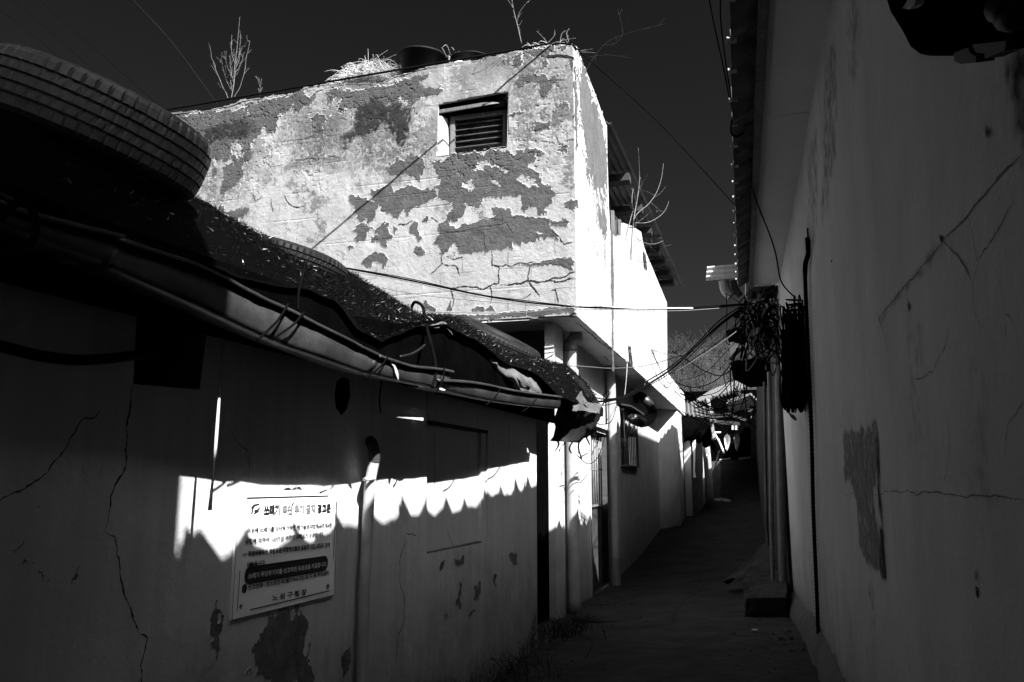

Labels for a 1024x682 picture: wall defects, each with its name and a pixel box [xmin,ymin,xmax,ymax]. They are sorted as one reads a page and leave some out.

peeling [176,71,444,222]
peeling [347,44,609,272]
crack [398,190,631,366]
crack [879,155,1022,342]
crack [0,408,103,501]
crack [104,385,148,682]
crack [844,490,1024,500]
peeling [208,598,225,662]
peeling [244,604,315,682]